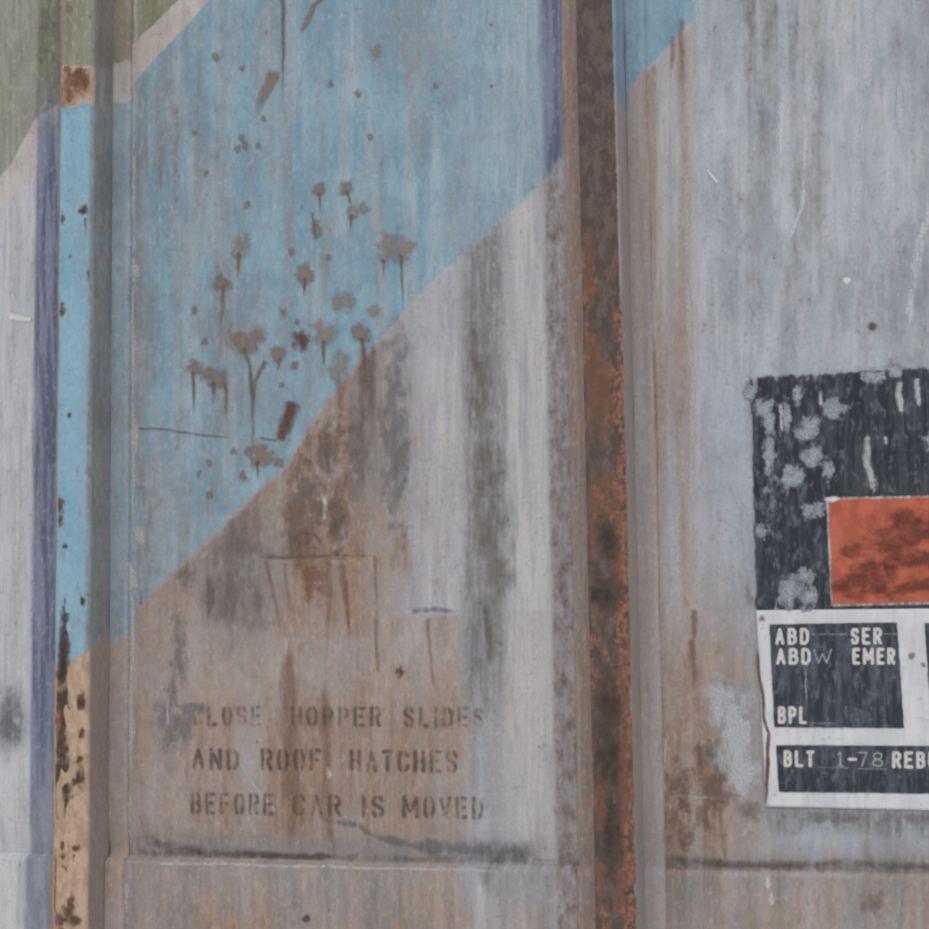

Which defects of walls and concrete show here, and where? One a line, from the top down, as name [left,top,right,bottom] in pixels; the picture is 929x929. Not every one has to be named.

rust [261,0,285,101]
rust [189,360,227,412]
rust [231,320,333,414]
rust [277,401,299,440]
peeling [742,382,848,491]
peeling [860,363,907,385]
peeling [754,523,767,541]
peeling [800,496,840,521]
peeling [777,566,818,612]
rust [55,598,85,813]
rust [593,678,625,874]
rust [54,841,81,927]